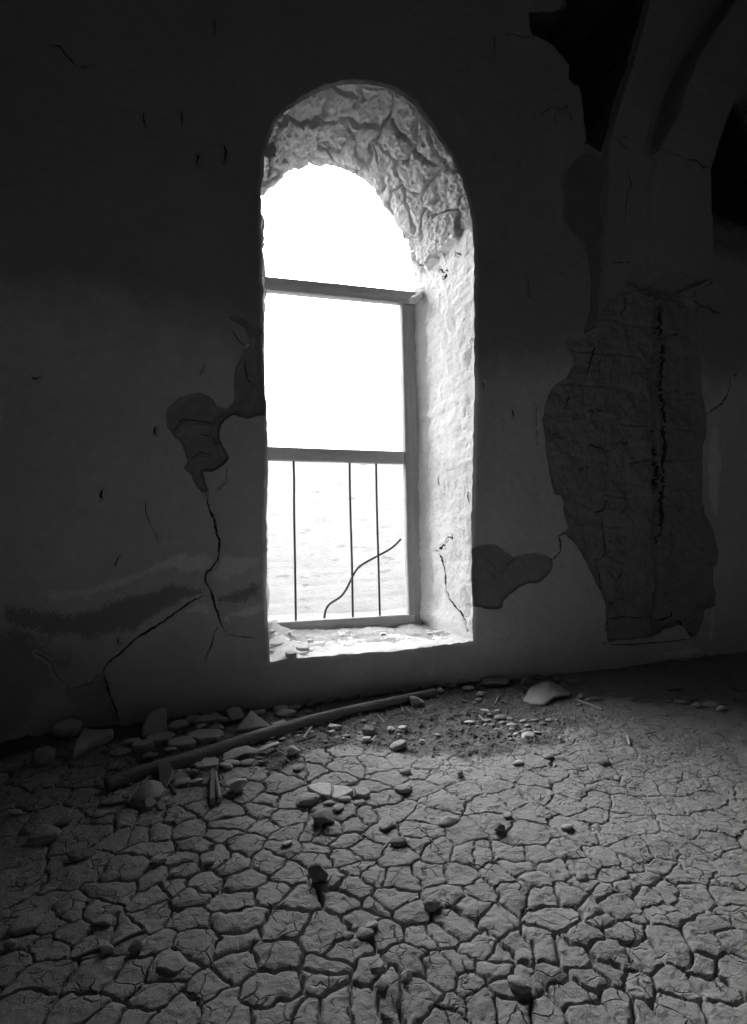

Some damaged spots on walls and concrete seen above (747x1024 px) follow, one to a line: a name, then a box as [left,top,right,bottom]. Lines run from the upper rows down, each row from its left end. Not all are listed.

spalling [151,315,267,495]
spalling [542,268,718,642]
crack [93,491,255,726]
crack [436,534,468,629]
spalling [471,544,553,609]